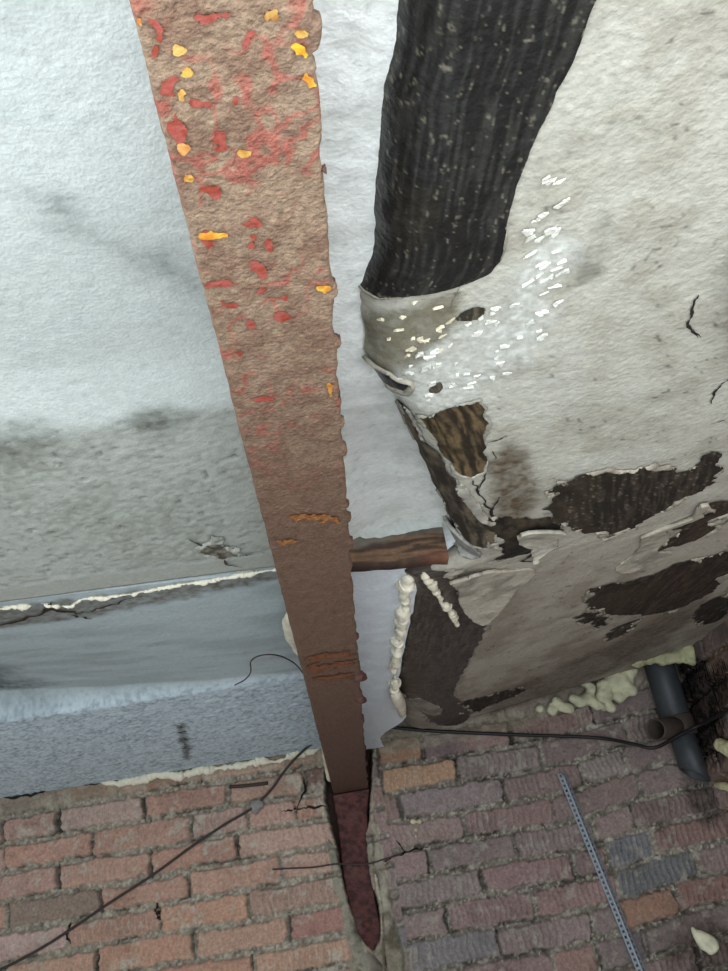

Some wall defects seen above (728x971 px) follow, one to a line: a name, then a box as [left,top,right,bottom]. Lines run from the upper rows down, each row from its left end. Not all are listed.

flaking render [358,0,596,305]
leakage [364,302,456,373]
crack [472,436,506,517]
flaking render [362,197,728,726]
spalling [192,535,242,561]
rust [288,514,340,524]
crack [0,597,134,626]
rust [352,669,367,683]